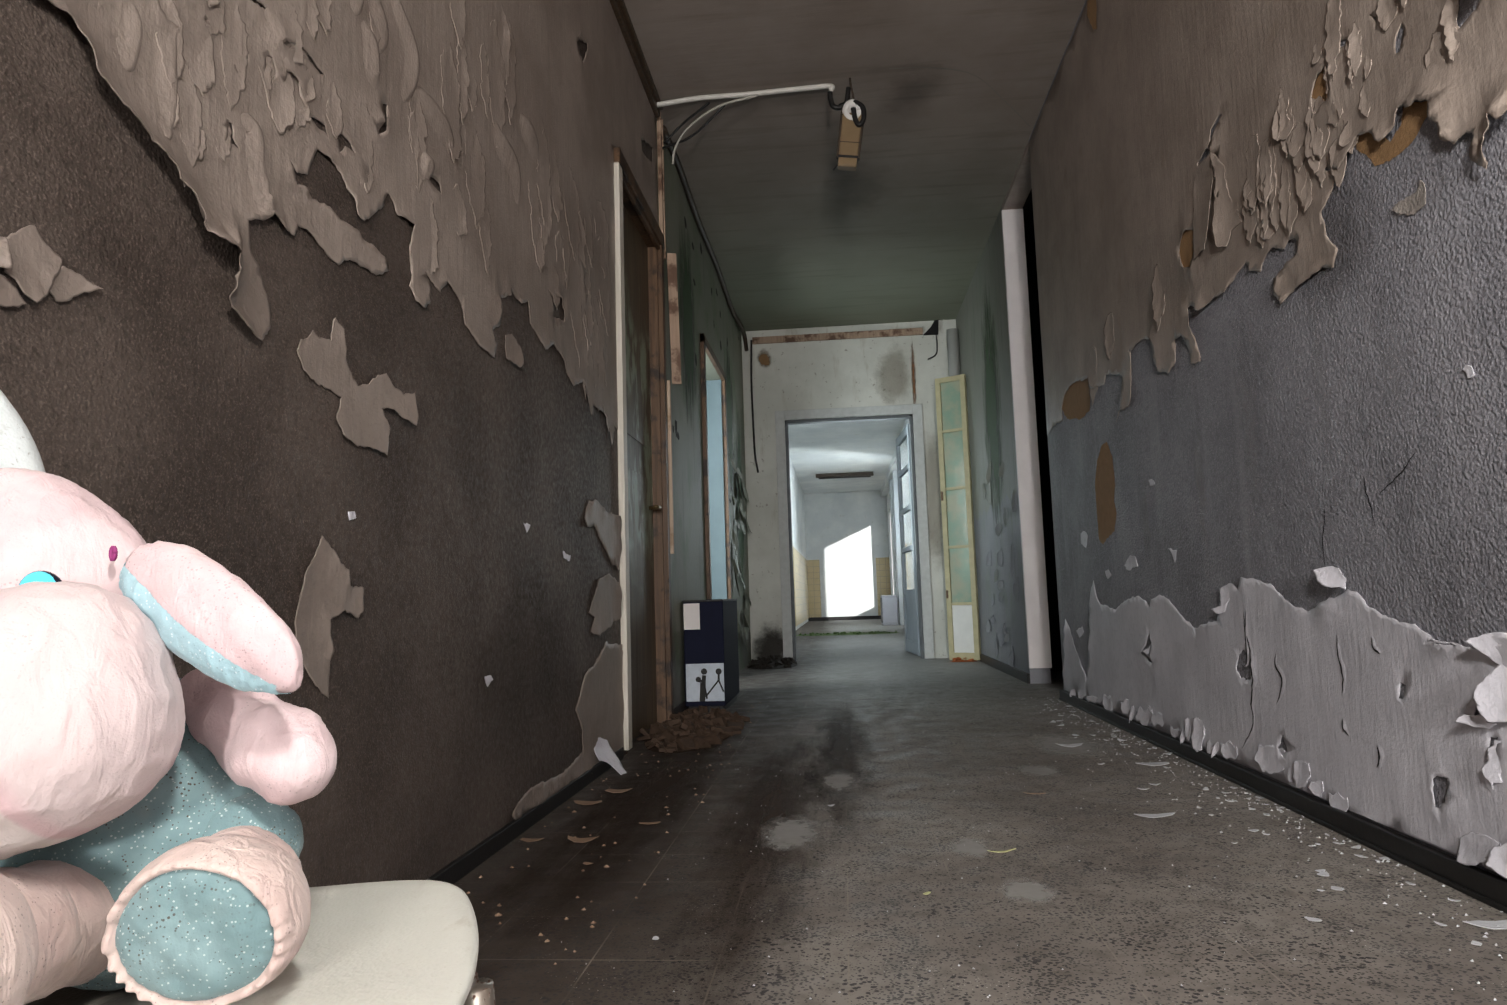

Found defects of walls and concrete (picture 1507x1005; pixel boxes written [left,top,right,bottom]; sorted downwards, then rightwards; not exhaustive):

peeling [0,225,103,308]
peeling [48,0,658,455]
peeling [1029,0,1507,436]
flaking render [1081,442,1117,548]
peeling [512,500,627,820]
peeling [1062,555,1507,879]